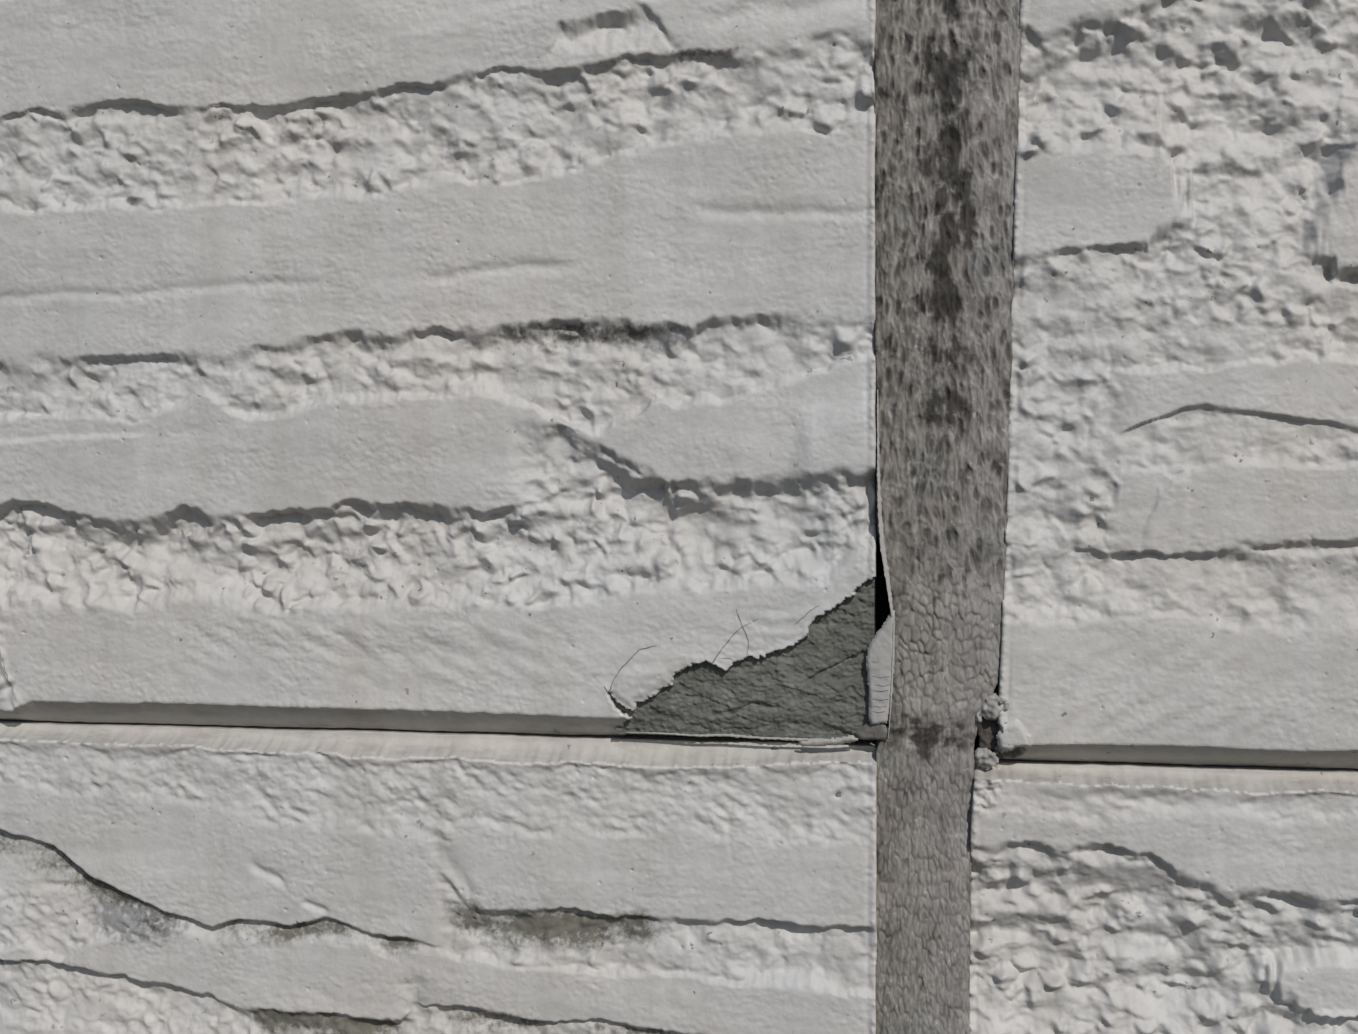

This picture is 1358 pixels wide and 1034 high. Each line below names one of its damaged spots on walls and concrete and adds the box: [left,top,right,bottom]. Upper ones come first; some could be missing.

spalling [609,577,895,750]